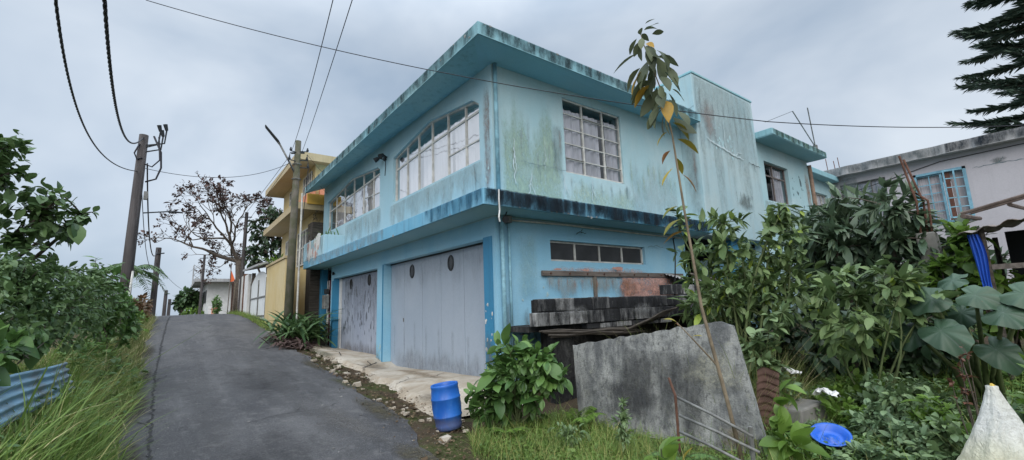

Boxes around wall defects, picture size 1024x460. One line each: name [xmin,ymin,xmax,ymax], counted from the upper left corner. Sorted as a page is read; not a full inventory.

damp [452,126,708,232]
crack [138,317,170,460]